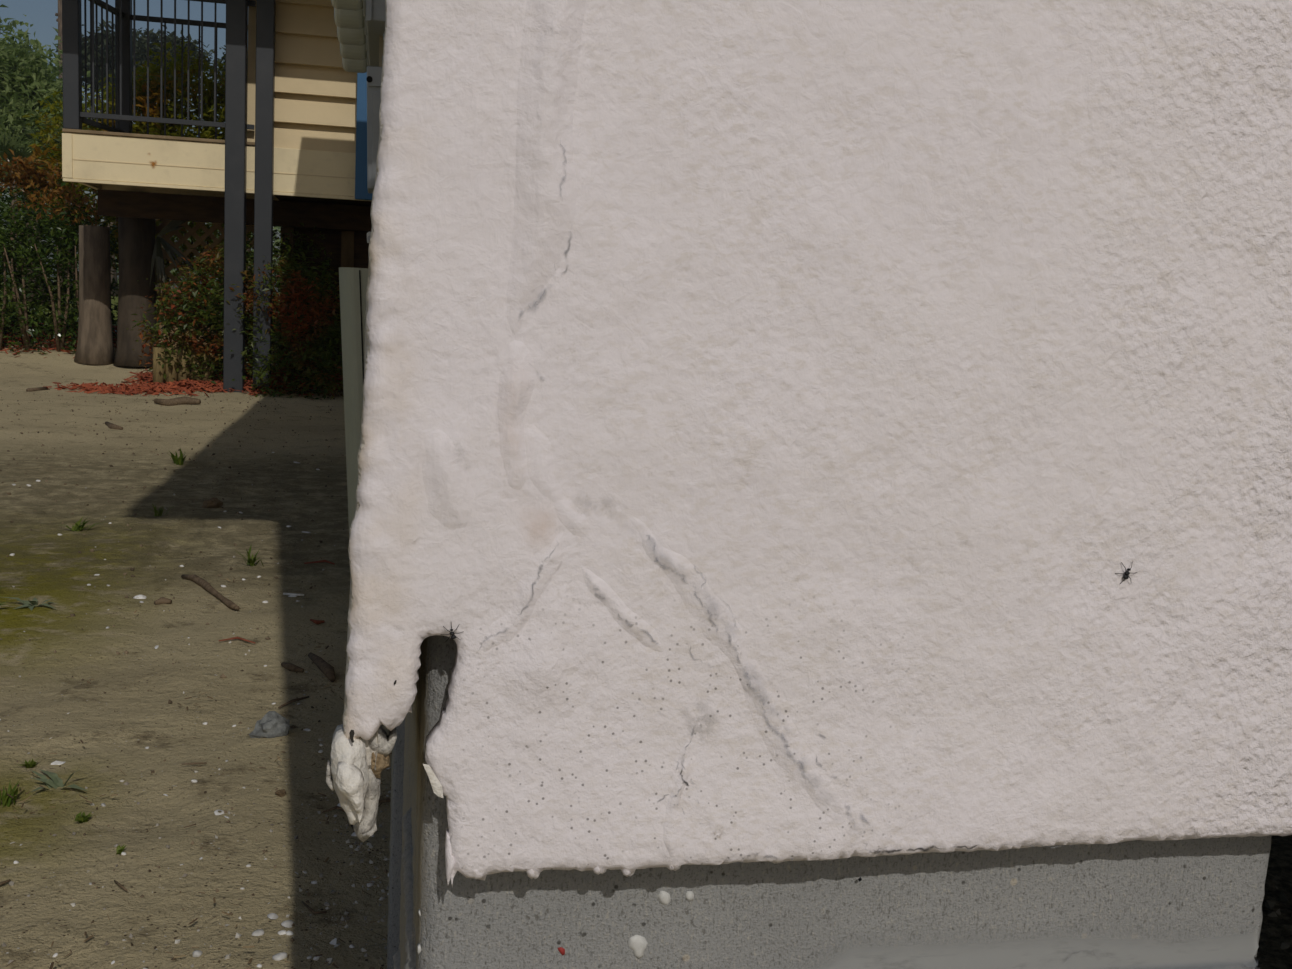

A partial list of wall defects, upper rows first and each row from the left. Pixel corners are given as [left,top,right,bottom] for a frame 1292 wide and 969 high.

flaking render [326,724,397,842]
peeling [423,764,443,798]